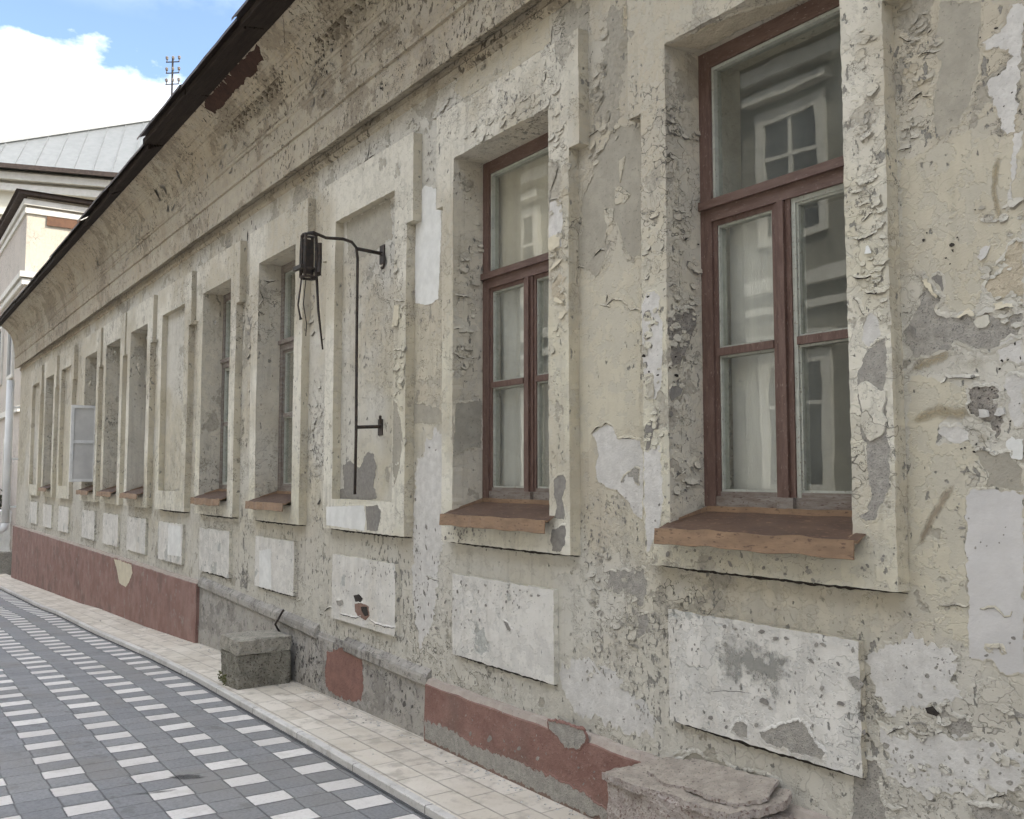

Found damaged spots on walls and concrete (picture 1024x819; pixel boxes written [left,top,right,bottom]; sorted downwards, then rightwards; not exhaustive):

spalling [201,42,268,178]
peeling [344,64,572,328]
peeling [853,83,880,144]
peeling [860,245,891,304]
spalling [899,0,1024,495]
spalling [298,380,382,555]
spalling [424,61,703,819]
spalling [857,335,896,524]
crack [664,566,908,594]
spalling [672,748,784,788]
spalling [708,654,845,762]
peeling [848,625,1024,819]